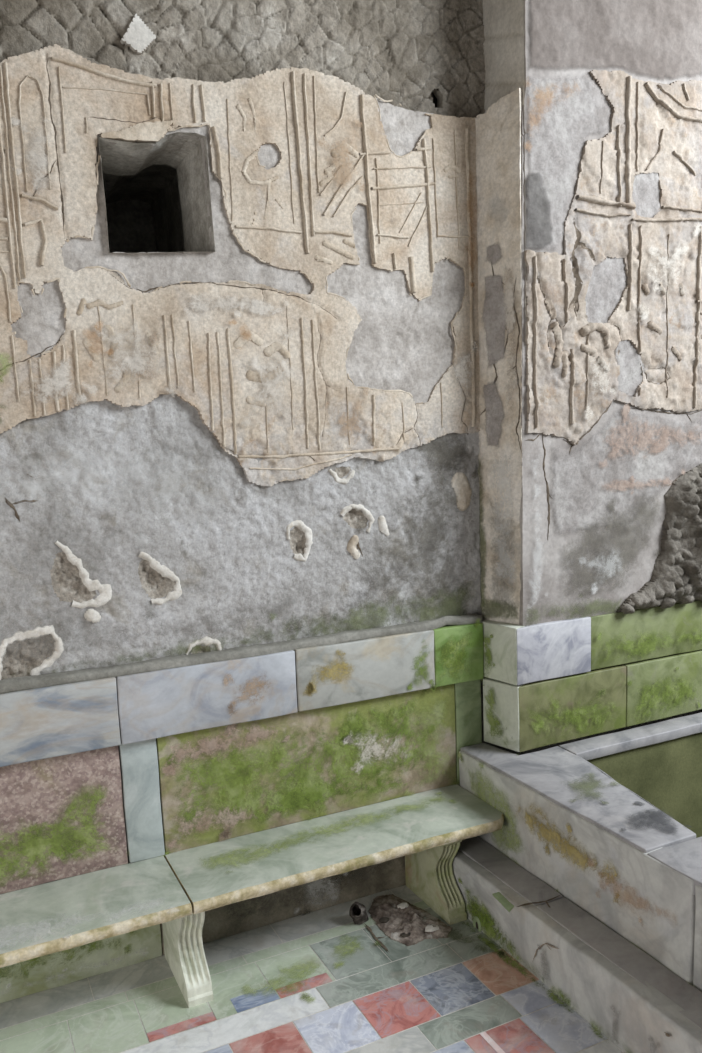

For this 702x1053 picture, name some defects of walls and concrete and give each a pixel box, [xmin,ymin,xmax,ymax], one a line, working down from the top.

flaking render [11,123,466,404]
crack [491,218,702,534]
spalling [287,520,313,561]
spalling [340,504,375,532]
spalling [50,540,112,623]
spalling [138,552,182,605]
spalling [0,625,64,680]
spalling [185,636,222,655]
damp [162,678,290,776]
damp [344,734,406,772]
damp [168,807,252,848]
damp [518,806,619,903]